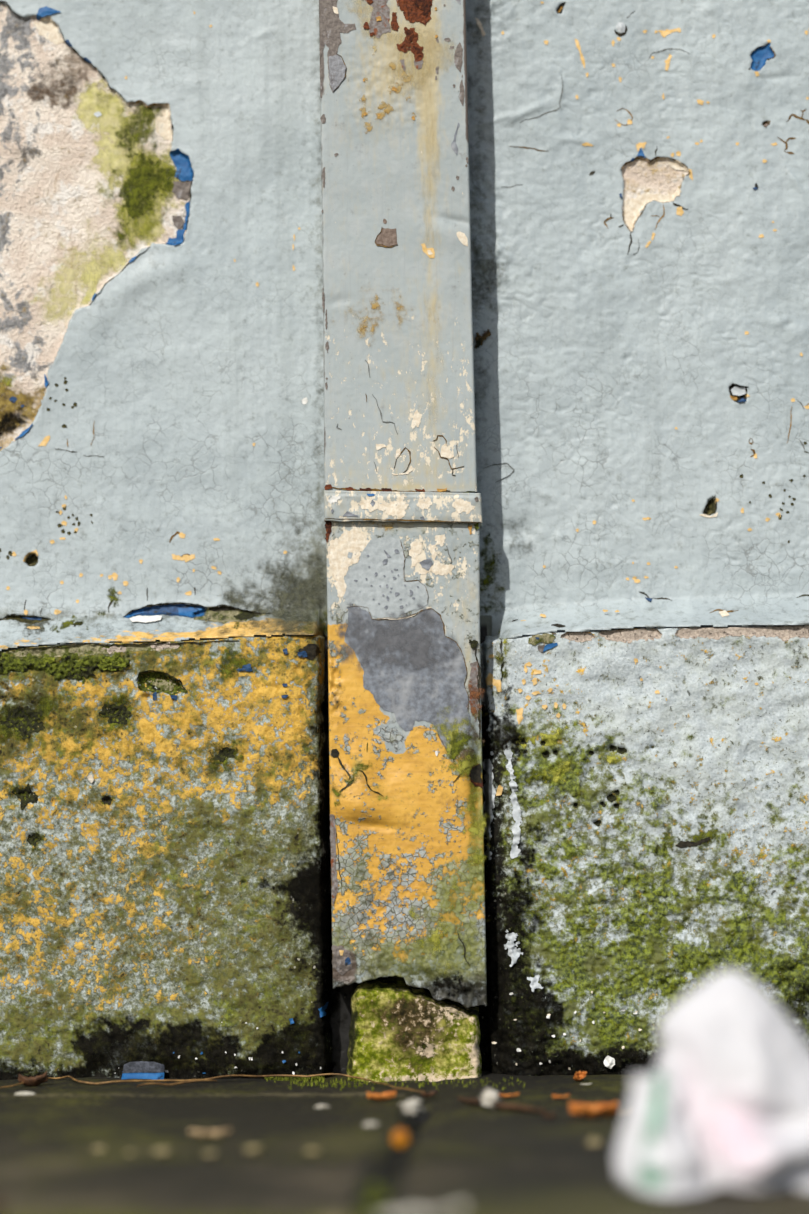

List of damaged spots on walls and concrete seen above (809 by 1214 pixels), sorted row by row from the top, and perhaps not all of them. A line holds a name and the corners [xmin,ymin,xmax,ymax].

rust [358,0,438,132]
peeling [749,40,776,76]
peeling [0,1,193,451]
peeling [604,142,693,255]
spalling [0,548,38,566]
spalling [7,640,239,658]
peeling [325,494,478,760]
leakage [310,701,329,737]
leakage [60,753,340,1079]
leakage [478,686,656,1076]
leakage [779,965,809,1044]
leakage [0,1059,44,1080]